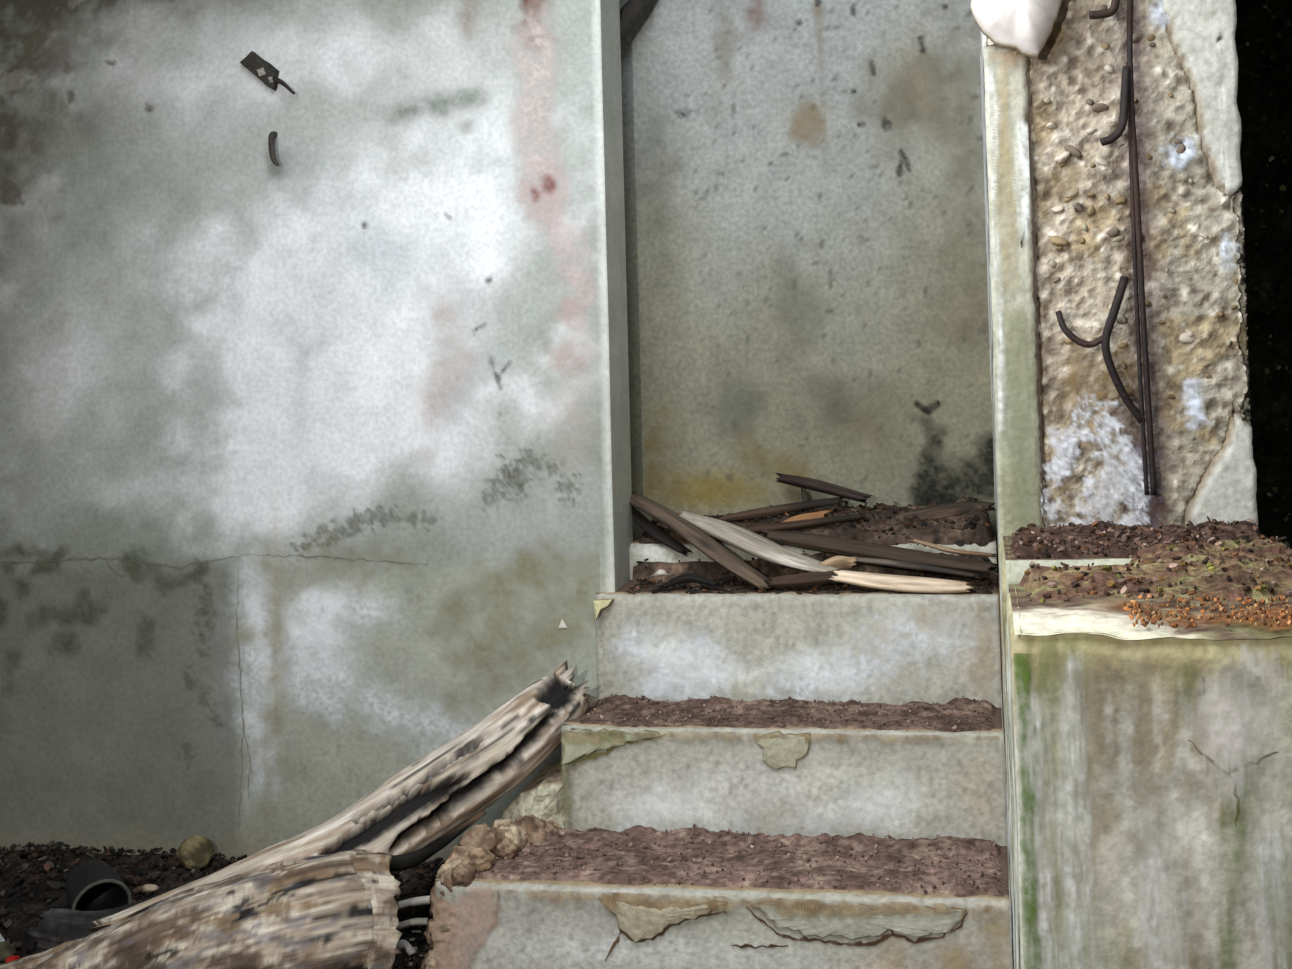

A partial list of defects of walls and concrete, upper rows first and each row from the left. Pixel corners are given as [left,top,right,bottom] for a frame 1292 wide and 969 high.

water stain [980,56,1162,527]
spalling [1012,0,1251,528]
water stain [293,628,351,711]
water stain [366,689,472,738]
flaking render [433,888,999,969]
flaking render [561,728,942,770]
crack [599,898,968,961]
water stain [995,648,1107,969]
water stain [1128,784,1184,969]
water stain [1256,820,1286,969]